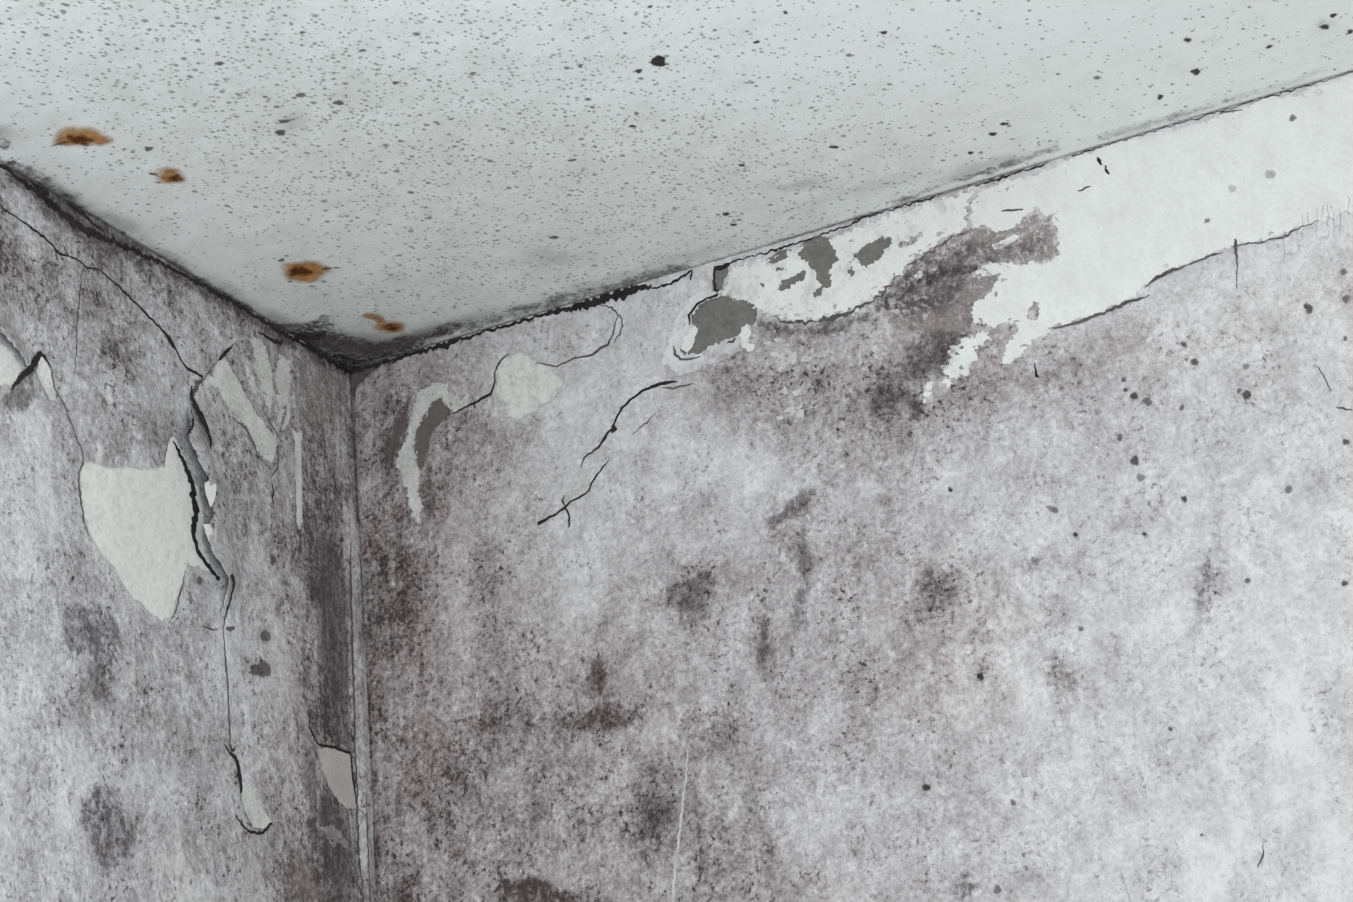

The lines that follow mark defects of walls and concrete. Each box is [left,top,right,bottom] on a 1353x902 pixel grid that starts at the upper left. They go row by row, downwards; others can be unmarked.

corrosion [54,129,109,146]
crack [1072,71,1353,192]
corrosion [149,169,183,183]
corrosion [286,262,339,282]
peeling [660,73,1353,422]
crack [1232,239,1240,287]
peeling [0,257,58,410]
leakage [760,318,864,335]
leakage [912,402,924,421]
flaking render [74,336,291,623]
crack [0,162,1048,794]
leakage [497,866,575,902]